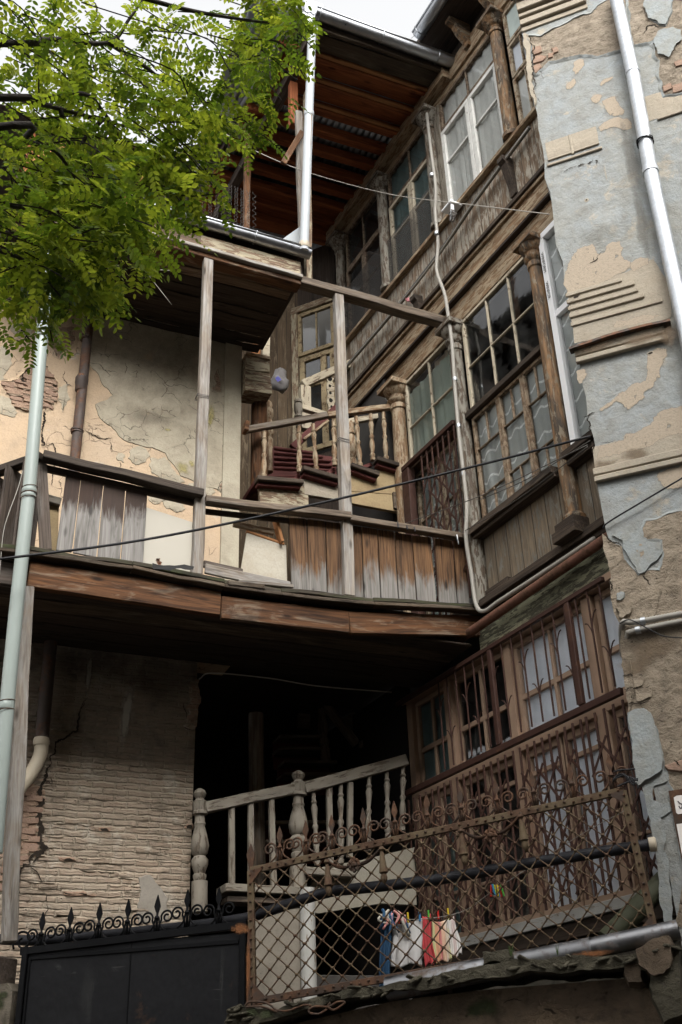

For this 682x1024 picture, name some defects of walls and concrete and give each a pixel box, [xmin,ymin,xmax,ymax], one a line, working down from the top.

flaking render [523,0,621,106]
flaking render [623,0,682,98]
peeling [591,77,632,131]
peeling [563,241,649,298]
peeling [614,314,660,328]
flaking render [0,324,79,417]
peeling [597,406,682,458]
peeling [657,465,682,489]
flaking render [602,508,682,927]
crack [19,697,88,923]